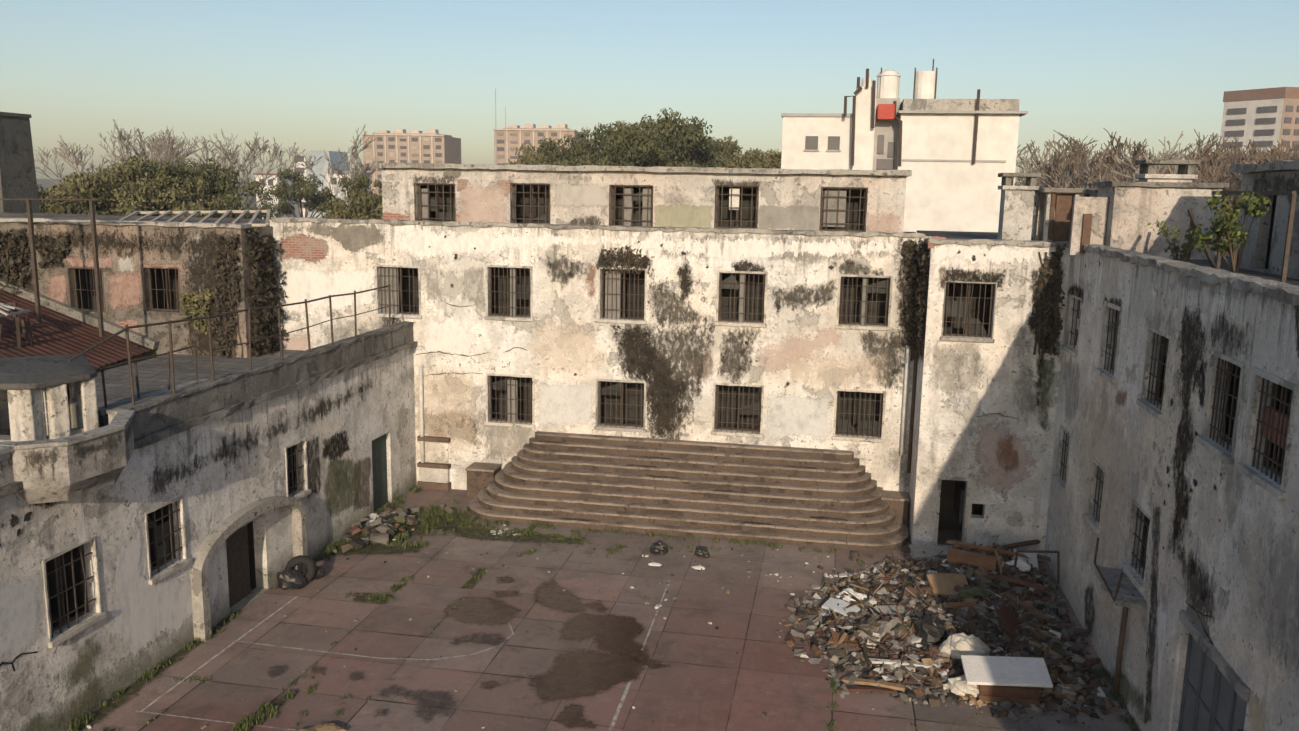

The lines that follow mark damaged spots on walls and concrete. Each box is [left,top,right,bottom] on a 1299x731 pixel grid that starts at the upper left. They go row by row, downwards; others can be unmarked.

spalling [278,211,410,263]
leakage [547,248,758,440]
leakage [732,260,765,272]
leakage [772,237,1007,388]
leakage [1027,248,1084,406]
leakage [1144,306,1247,723]
crack [0,651,38,672]